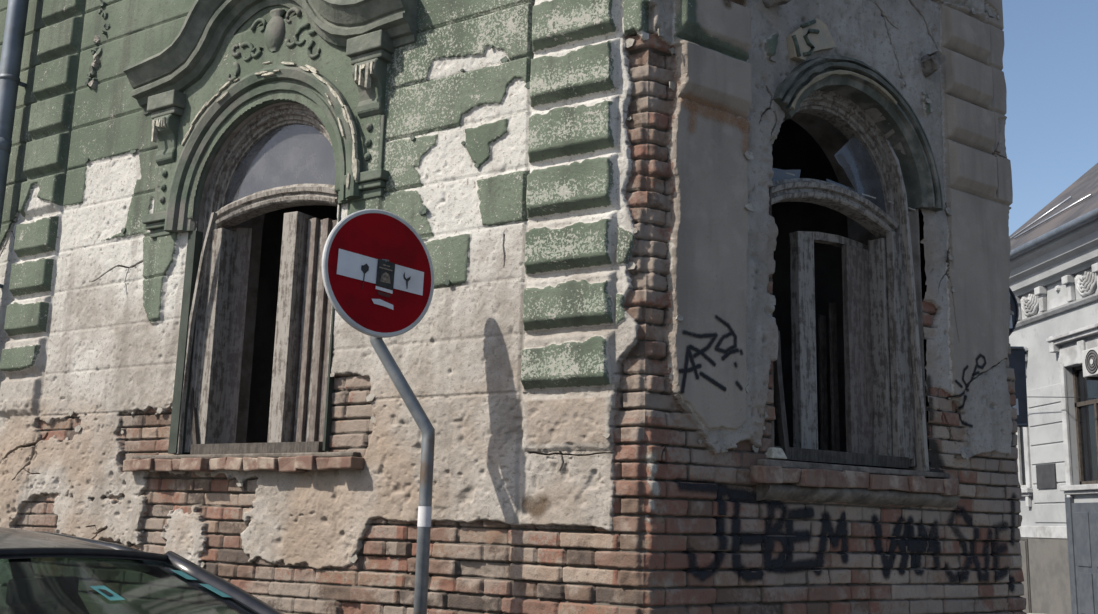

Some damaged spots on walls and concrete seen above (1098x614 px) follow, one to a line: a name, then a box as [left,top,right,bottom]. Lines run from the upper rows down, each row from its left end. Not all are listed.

crack [867,0,945,89]
peeling [182,78,240,146]
peeling [254,61,359,188]
peeling [77,150,141,247]
crack [88,258,144,300]
flaking render [410,0,1026,614]
crack [0,431,50,484]
flaking render [34,409,82,442]
flaking render [115,406,178,469]
flaking render [326,372,376,458]
flaking render [12,499,66,535]
flaking render [103,474,418,614]